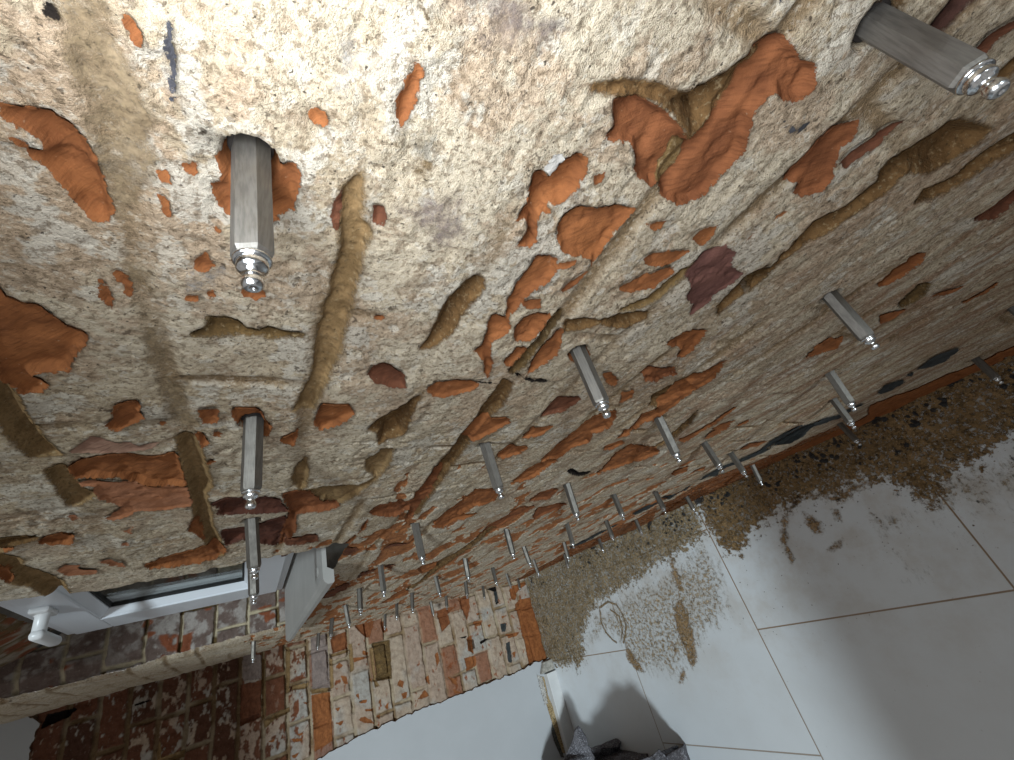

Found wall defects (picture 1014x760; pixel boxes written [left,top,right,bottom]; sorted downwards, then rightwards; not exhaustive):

spalling [0,102,116,223]
spalling [588,32,817,206]
spalling [426,153,636,398]
peeling [619,225,718,293]
spalling [0,288,89,395]
spalling [313,403,355,431]
spalling [366,362,407,389]
spalling [65,451,245,570]
spalling [209,490,340,557]
spalling [343,462,443,556]
spalling [432,329,1014,703]
spalling [330,621,430,699]